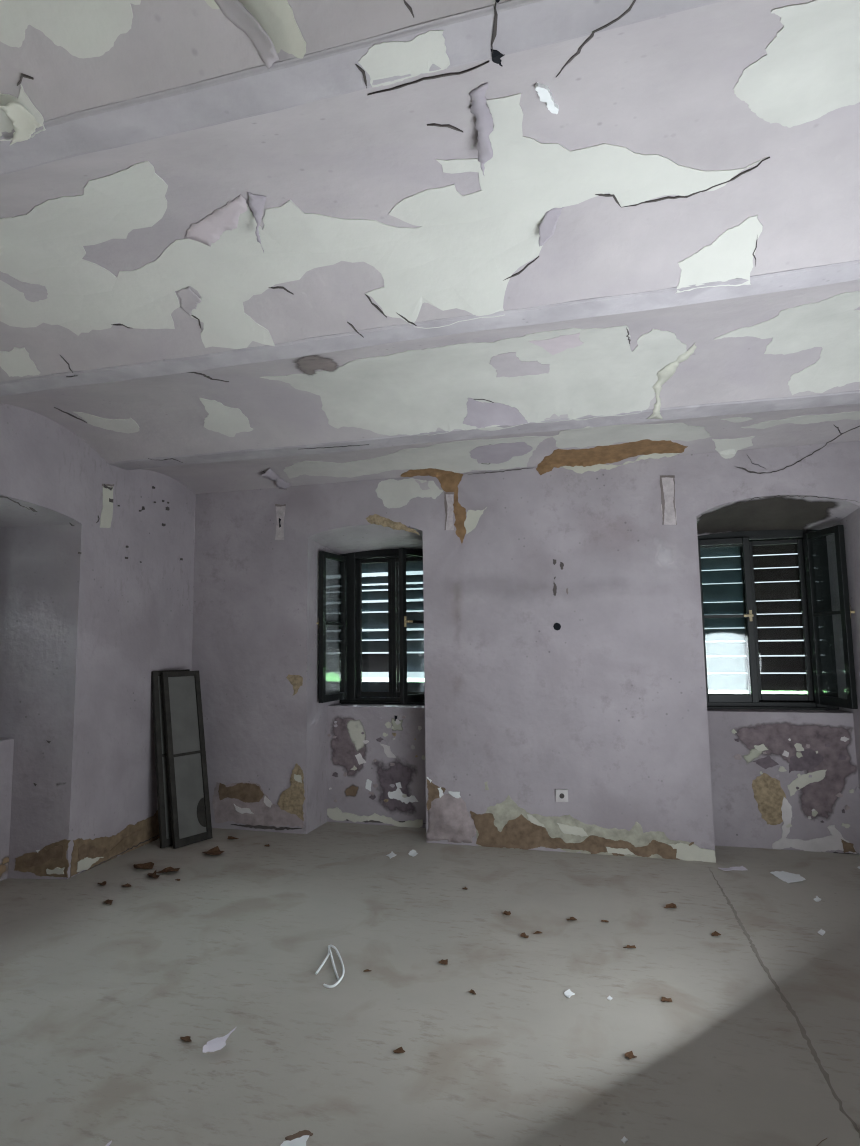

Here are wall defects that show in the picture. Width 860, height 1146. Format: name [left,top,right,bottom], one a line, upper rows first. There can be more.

peeling [0,0,141,58]
peeling [355,30,505,96]
crack [490,1,498,52]
crack [556,0,636,77]
peeling [734,0,860,128]
peeling [0,73,770,349]
peeling [714,291,860,395]
peeling [260,325,860,543]
spalling [14,810,159,878]
peeling [327,715,426,828]
spalling [470,795,716,863]
peeling [732,722,860,854]